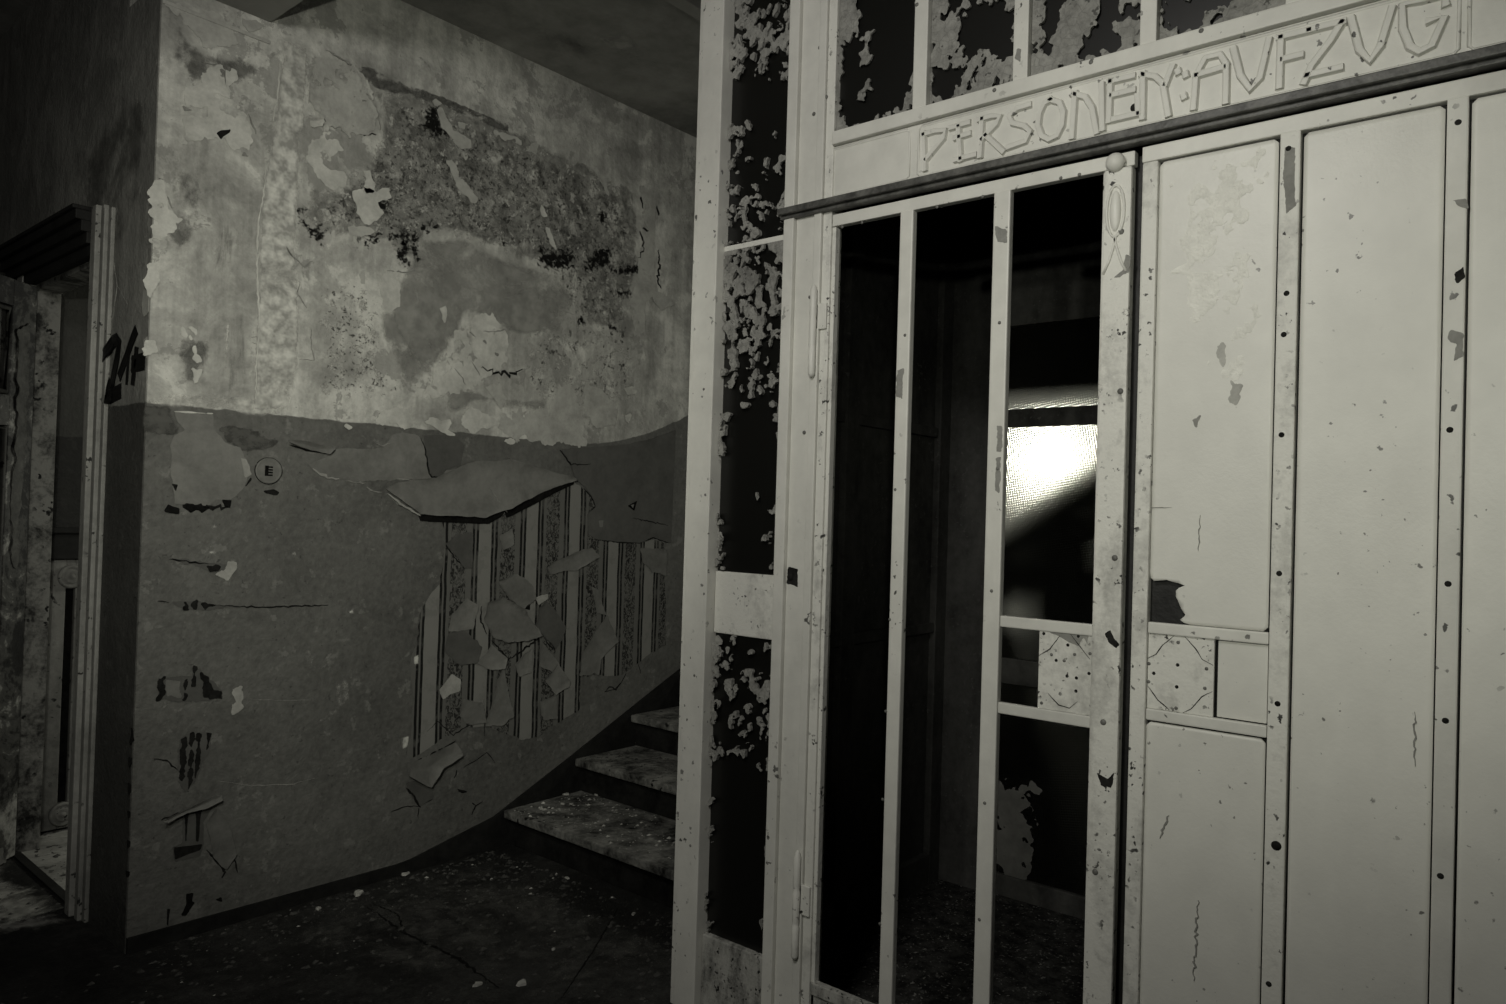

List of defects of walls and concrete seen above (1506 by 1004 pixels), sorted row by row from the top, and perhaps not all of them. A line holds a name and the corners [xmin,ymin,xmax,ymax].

peeling [730,0,790,81]
peeling [837,0,1141,130]
peeling [1159,0,1286,40]
peeling [306,54,391,237]
peeling [433,99,478,203]
peeling [540,205,557,250]
peeling [359,269,401,313]
peeling [718,120,786,456]
peeling [755,492,776,544]
peeling [769,562,798,587]
peeling [709,635,771,780]
peeling [406,741,463,807]